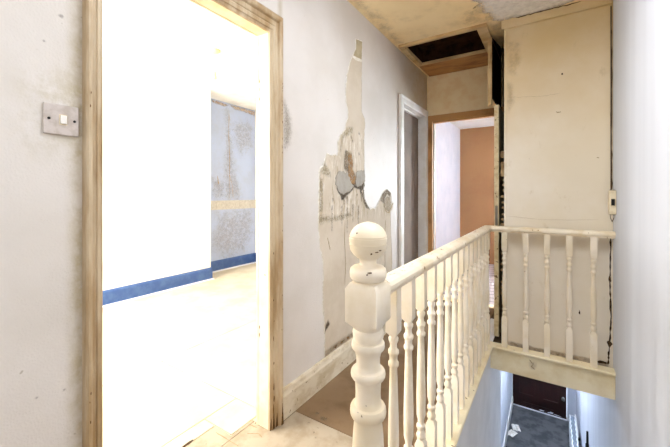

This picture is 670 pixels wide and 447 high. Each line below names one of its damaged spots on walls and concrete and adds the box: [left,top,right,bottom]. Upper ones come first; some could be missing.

flaking render [474,0,572,21]
flaking render [319,55,395,357]
crack [597,239,612,364]